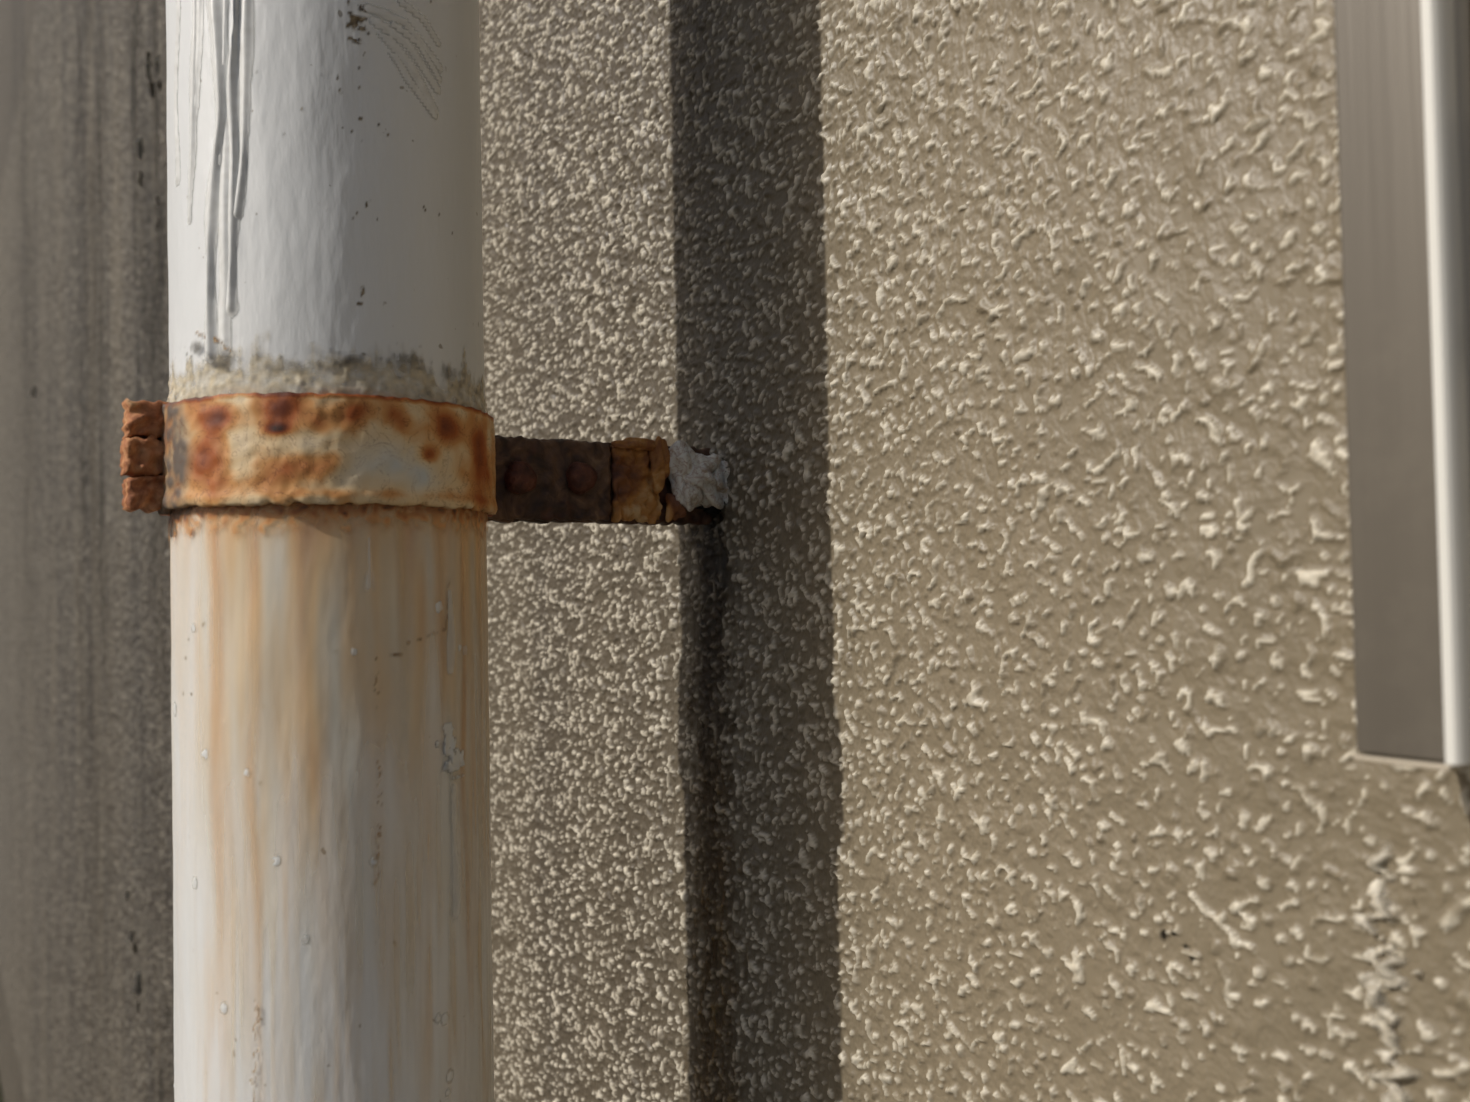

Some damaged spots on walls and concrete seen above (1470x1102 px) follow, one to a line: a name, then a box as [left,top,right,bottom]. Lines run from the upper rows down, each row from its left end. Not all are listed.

rust [168,502,489,850]